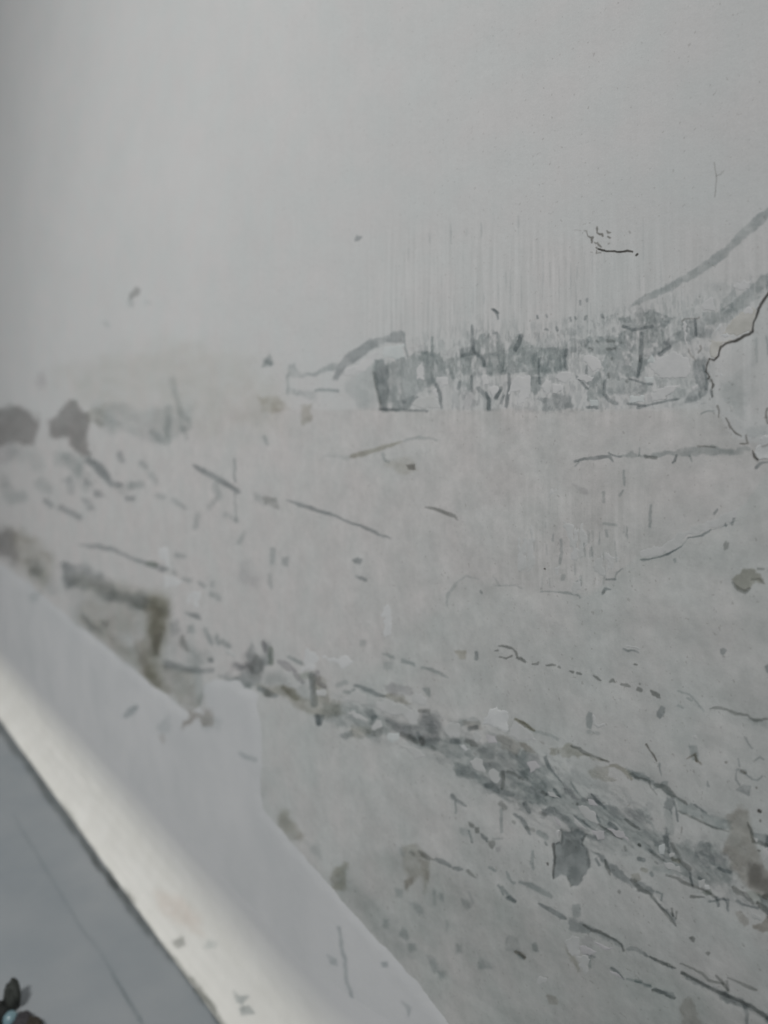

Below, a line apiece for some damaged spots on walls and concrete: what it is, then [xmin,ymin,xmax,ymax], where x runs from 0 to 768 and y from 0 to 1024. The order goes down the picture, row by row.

crack [708,293,768,360]
peeling [343,344,405,377]
peeling [412,362,448,410]
peeling [481,355,601,407]
peeling [629,321,699,403]
peeling [343,690,427,760]
peeling [444,707,536,784]
peeling [554,799,629,845]
peeling [658,844,682,873]